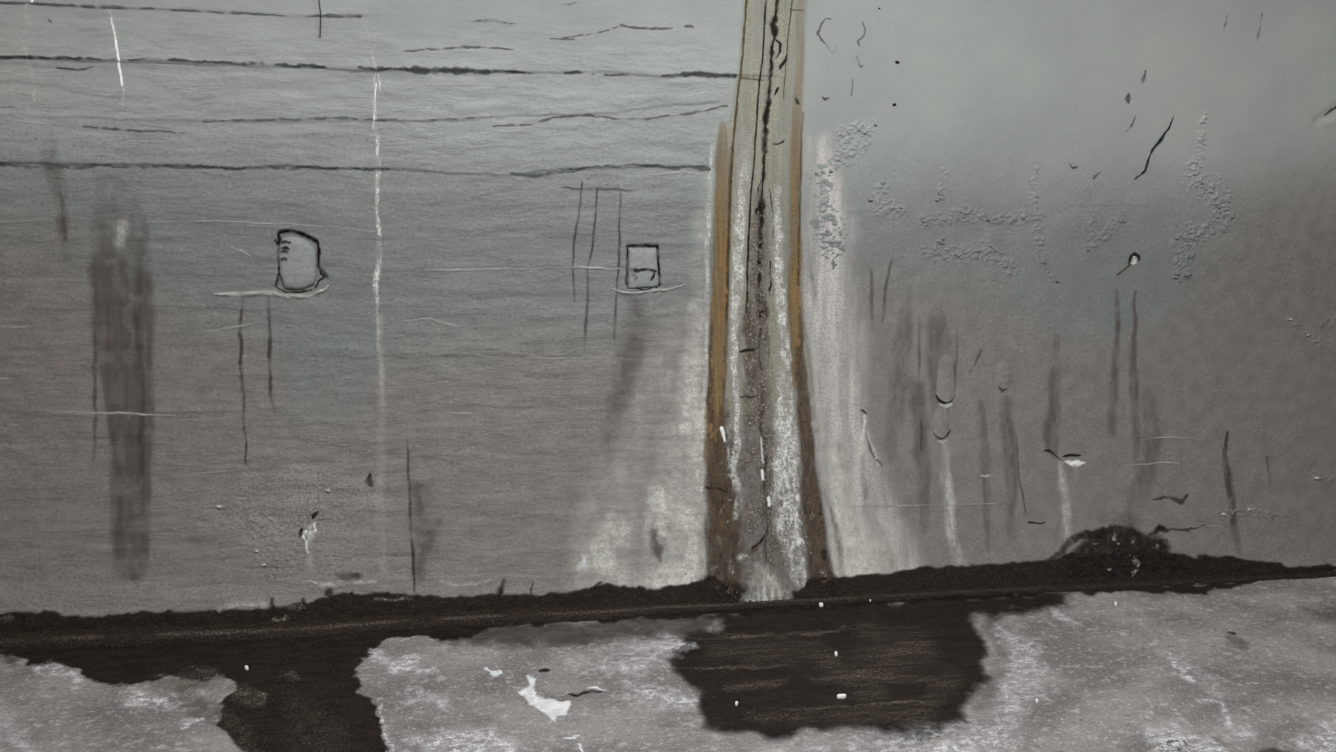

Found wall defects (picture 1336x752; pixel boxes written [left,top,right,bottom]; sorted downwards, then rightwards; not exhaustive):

crack [0,1,362,18]
crack [0,20,525,75]
crack [0,116,390,171]
crack [1134,117,1174,180]
spalling [275,229,326,293]
crack [429,0,799,566]
water stain [0,137,1336,633]
rust [705,170,739,593]
rust [789,142,833,583]
water stain [4,592,1065,752]
water stain [1146,723,1227,752]
water stain [1296,719,1336,752]